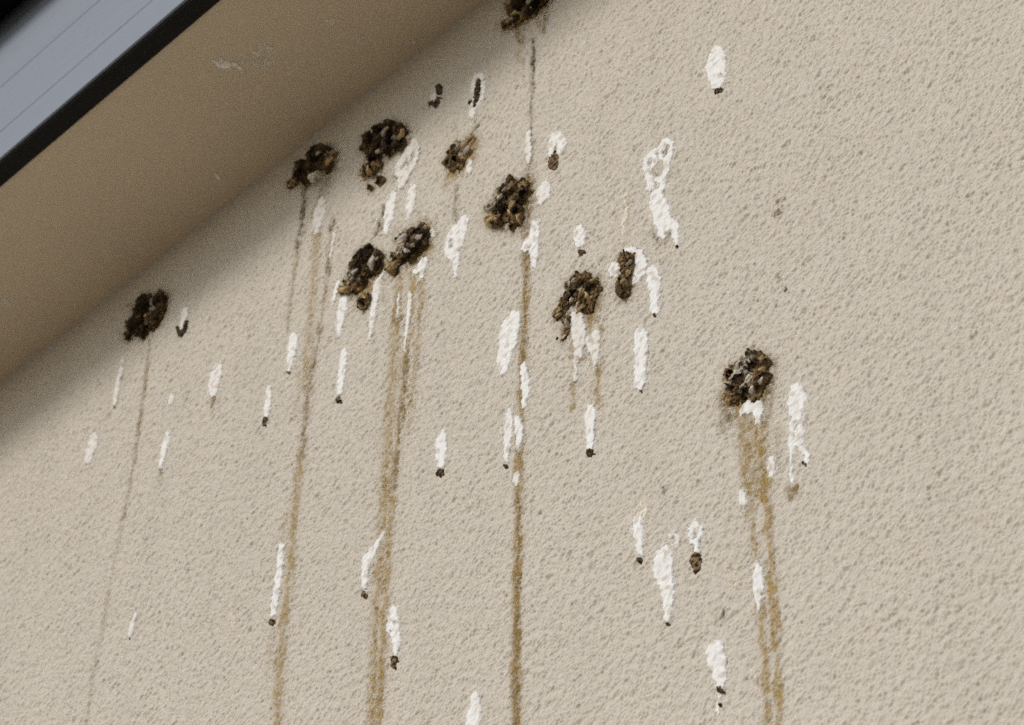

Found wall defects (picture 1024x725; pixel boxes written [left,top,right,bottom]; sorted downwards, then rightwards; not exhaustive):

leakage [520,251,531,366]
leakage [274,358,316,725]
leakage [370,276,423,724]
leakage [509,444,523,725]
leakage [725,406,783,725]